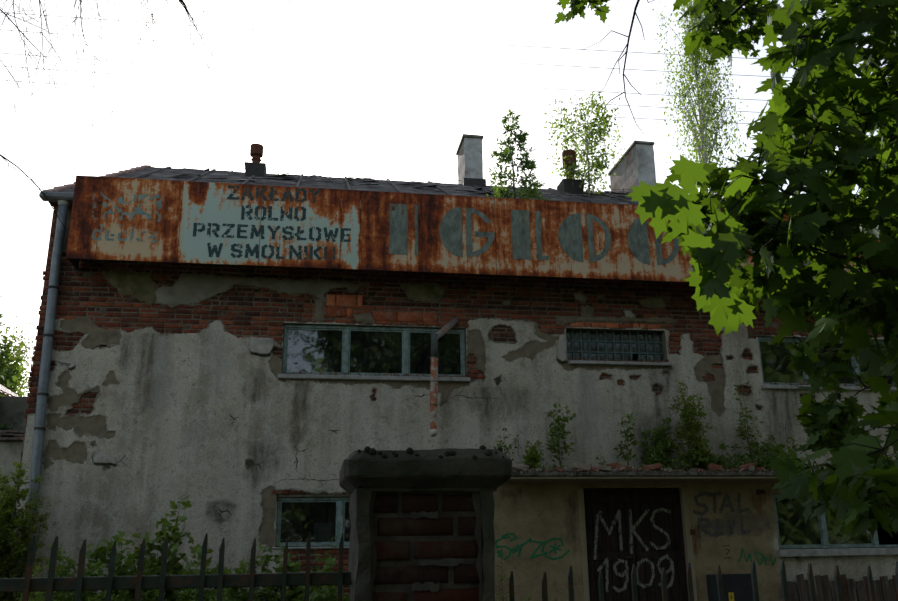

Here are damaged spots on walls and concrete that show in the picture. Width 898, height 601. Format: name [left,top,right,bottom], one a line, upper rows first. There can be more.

flaking render [25,372,39,418]
flaking render [33,252,783,471]